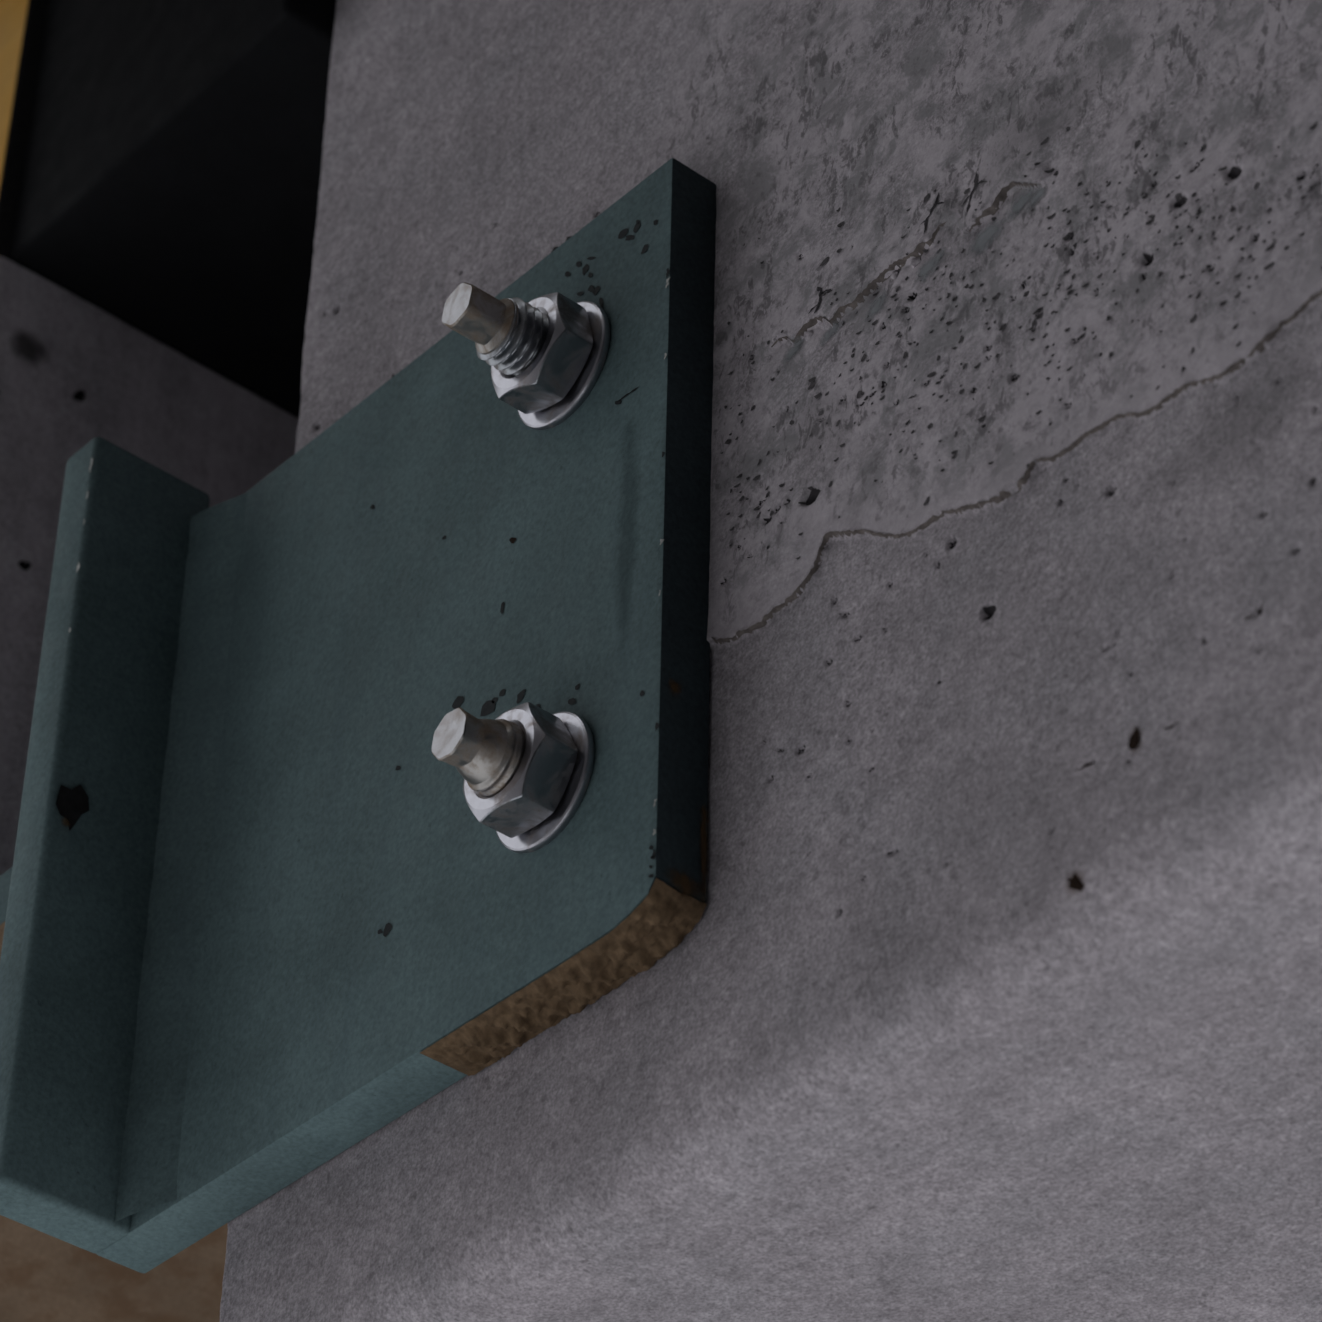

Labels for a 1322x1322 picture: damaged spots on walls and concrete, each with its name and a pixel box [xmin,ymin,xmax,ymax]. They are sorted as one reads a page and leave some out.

crack [921,172,988,233]
crack [808,287,832,314]
spalling [771,222,946,359]
spalling [1142,253,1154,280]
spalling [712,290,1322,644]